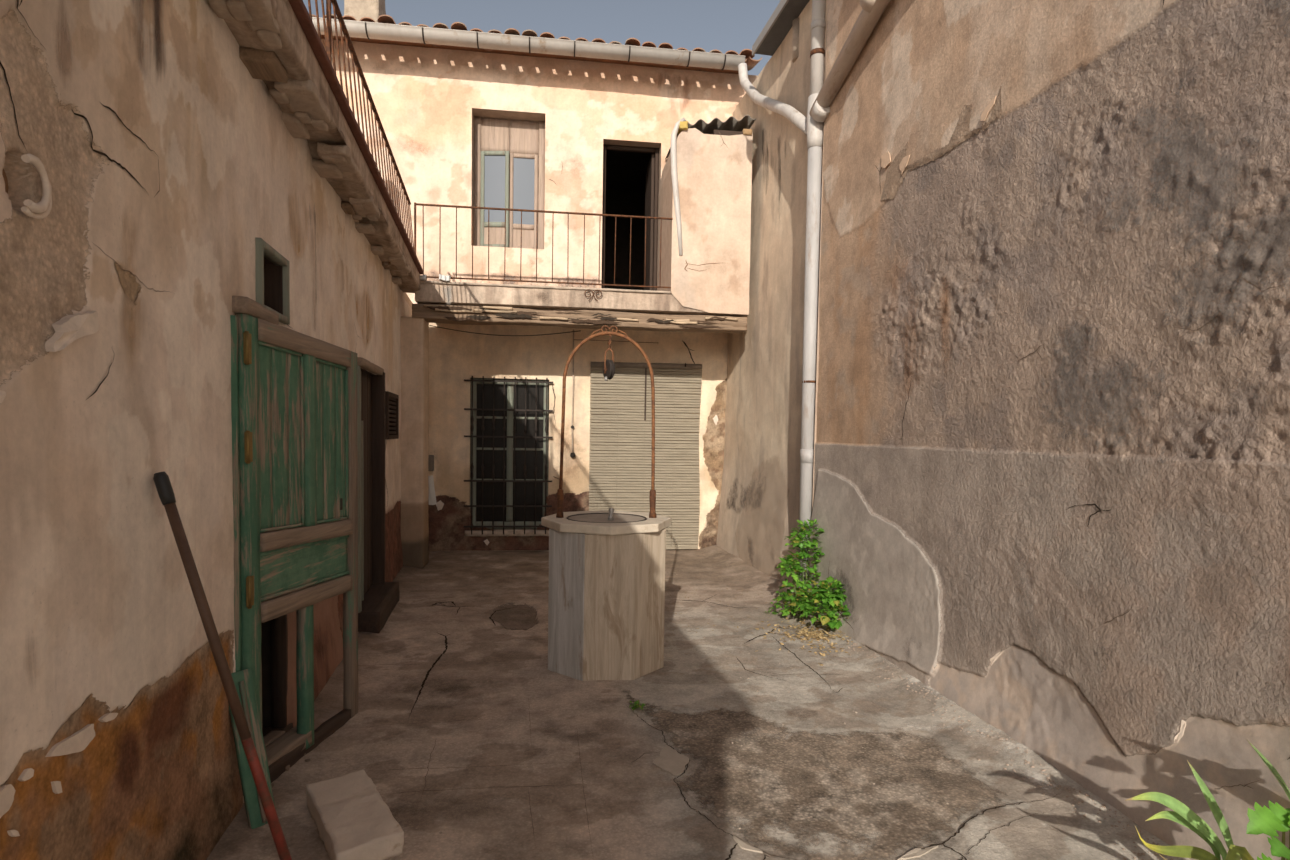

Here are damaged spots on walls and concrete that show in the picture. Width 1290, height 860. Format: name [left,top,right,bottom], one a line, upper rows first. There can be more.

flaking render [0,10,110,403]
crack [72,104,160,196]
flaking render [881,87,1002,201]
flaking render [699,378,727,549]
crack [1066,504,1110,525]
flaking render [0,630,244,860]
crack [362,601,550,834]
crack [577,706,796,860]
crack [914,796,1055,860]
flaking render [928,645,1290,860]